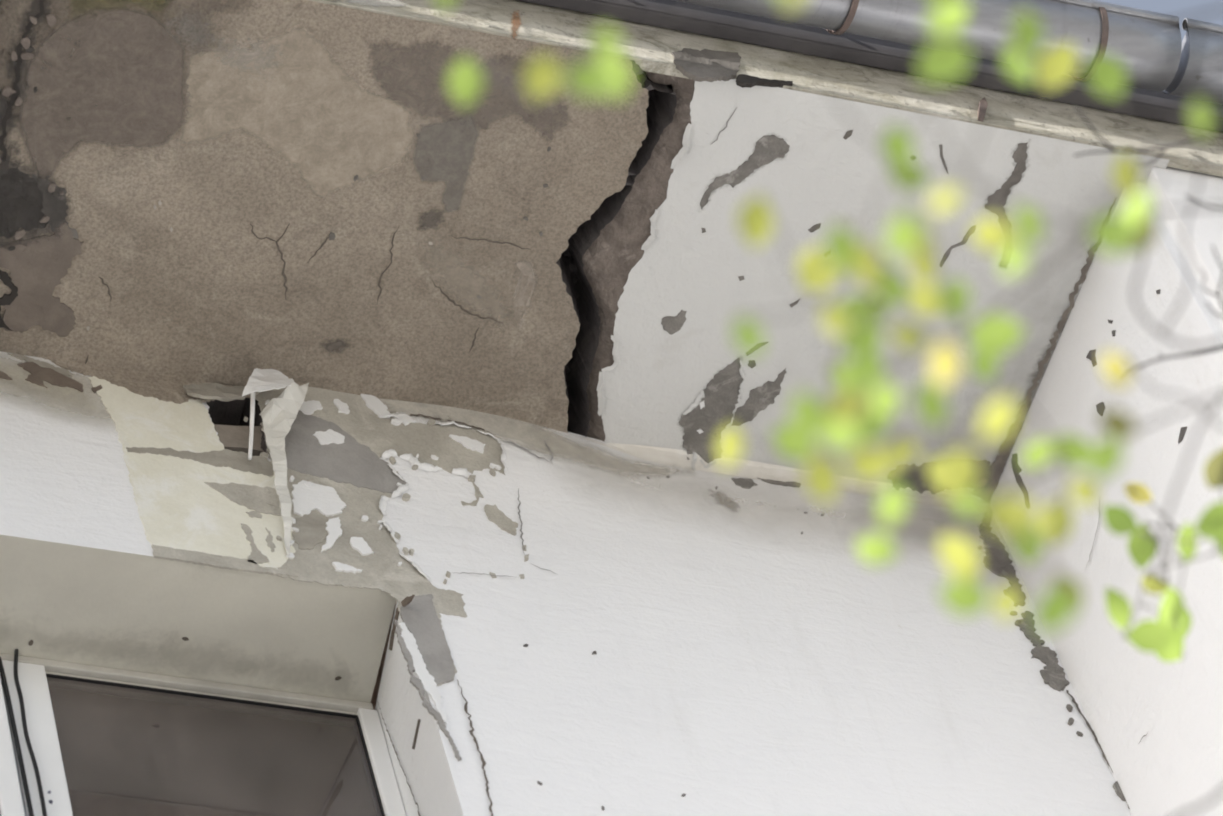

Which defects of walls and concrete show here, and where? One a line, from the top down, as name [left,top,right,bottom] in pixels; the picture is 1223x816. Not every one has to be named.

crack [0,0,68,331]
damp [0,0,568,229]
crack [250,223,329,299]
crack [409,60,793,464]
peeling [661,310,687,335]
peeling [678,353,787,471]
peeling [700,135,790,209]
peeling [939,225,976,267]
peeling [984,142,1028,227]
peeling [0,353,529,725]
crack [971,245,1130,809]
crack [377,595,493,816]